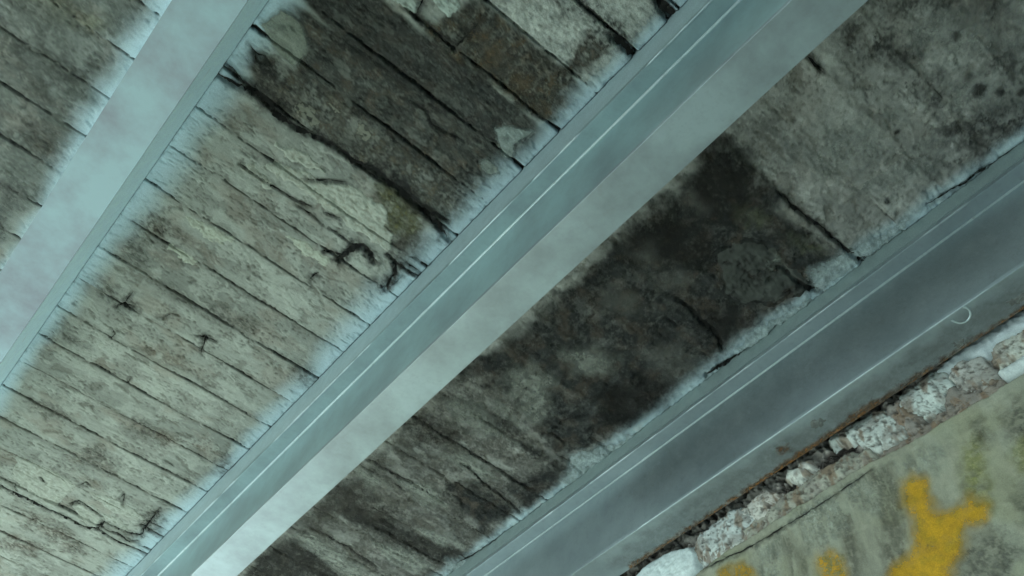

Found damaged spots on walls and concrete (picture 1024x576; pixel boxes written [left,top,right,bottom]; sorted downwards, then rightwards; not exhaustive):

crack [218,47,448,290]
damp [249,0,658,227]
crack [778,191,866,261]
damp [869,0,1024,156]
crack [2,478,162,552]
damp [246,137,909,576]
corrosion [629,306,1024,569]